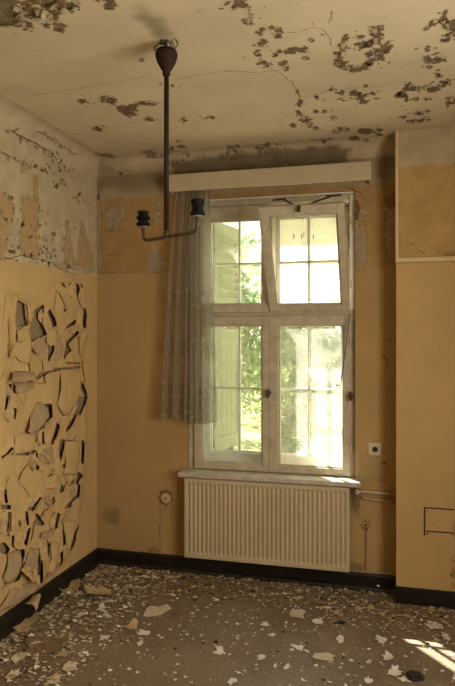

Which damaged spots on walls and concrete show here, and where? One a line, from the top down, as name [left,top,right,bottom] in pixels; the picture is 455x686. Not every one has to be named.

peeling [0,0,81,34]
peeling [219,0,324,72]
peeling [333,25,394,73]
peeling [390,10,455,124]
peeling [78,96,157,118]
peeling [279,90,338,130]
peeling [329,84,379,105]
peeling [383,207,396,265]
peeling [0,154,127,680]